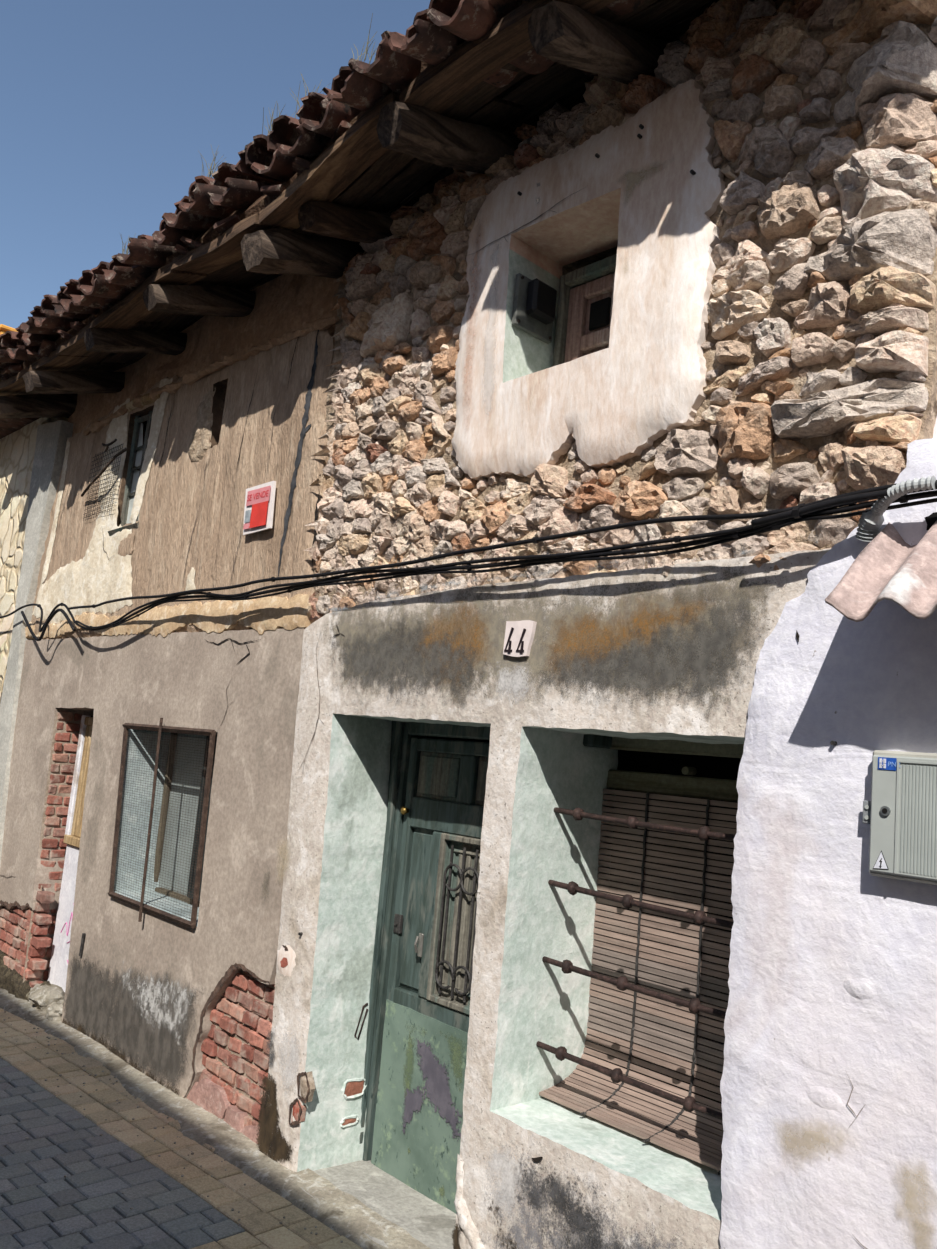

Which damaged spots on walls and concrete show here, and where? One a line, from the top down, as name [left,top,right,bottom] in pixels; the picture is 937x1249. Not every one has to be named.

crack [180,318,320,592]
flaking render [185,567,196,596]
crack [205,638,257,726]
leakage [323,562,767,716]
flaking render [0,885,65,1021]
leakage [62,957,195,1095]
flaking render [183,944,296,1144]
flaking render [288,1071,316,1126]
leakage [484,1152,676,1249]